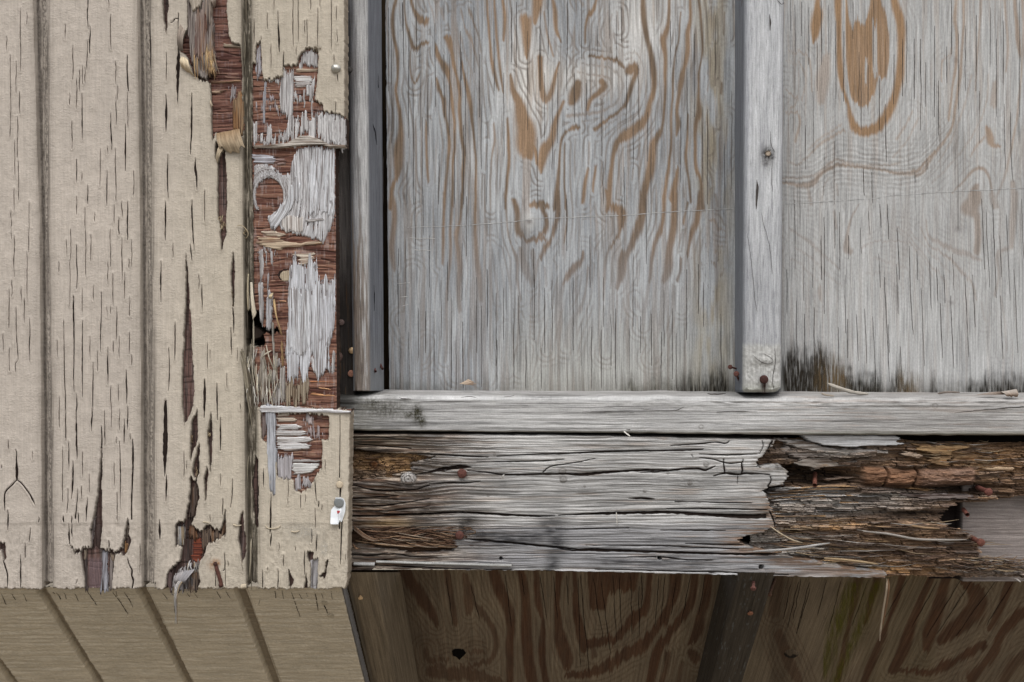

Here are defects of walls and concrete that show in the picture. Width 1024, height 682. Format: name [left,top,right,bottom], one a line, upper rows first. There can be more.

crack [3,9,30,371]
peeling [177,0,352,495]
crack [753,0,1024,392]
crack [53,0,869,676]
leakage [783,348,919,392]
leakage [968,377,1024,393]
crack [1,442,40,604]
spalling [76,517,131,595]
spalling [167,477,241,624]